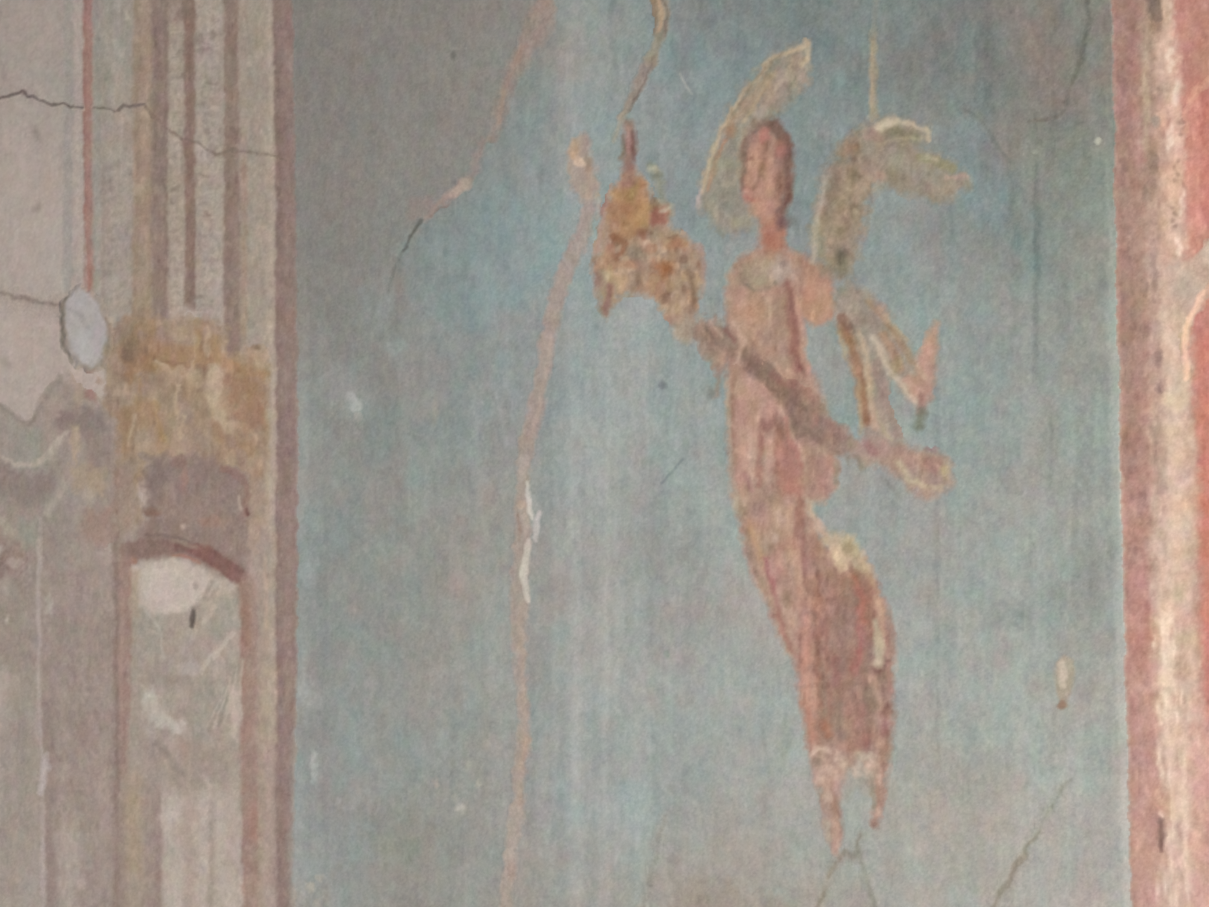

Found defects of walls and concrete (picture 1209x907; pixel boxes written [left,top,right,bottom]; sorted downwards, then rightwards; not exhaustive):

crack [0,86,295,163]
crack [0,284,67,325]
crack [808,827,882,907]
crack [984,772,1078,907]